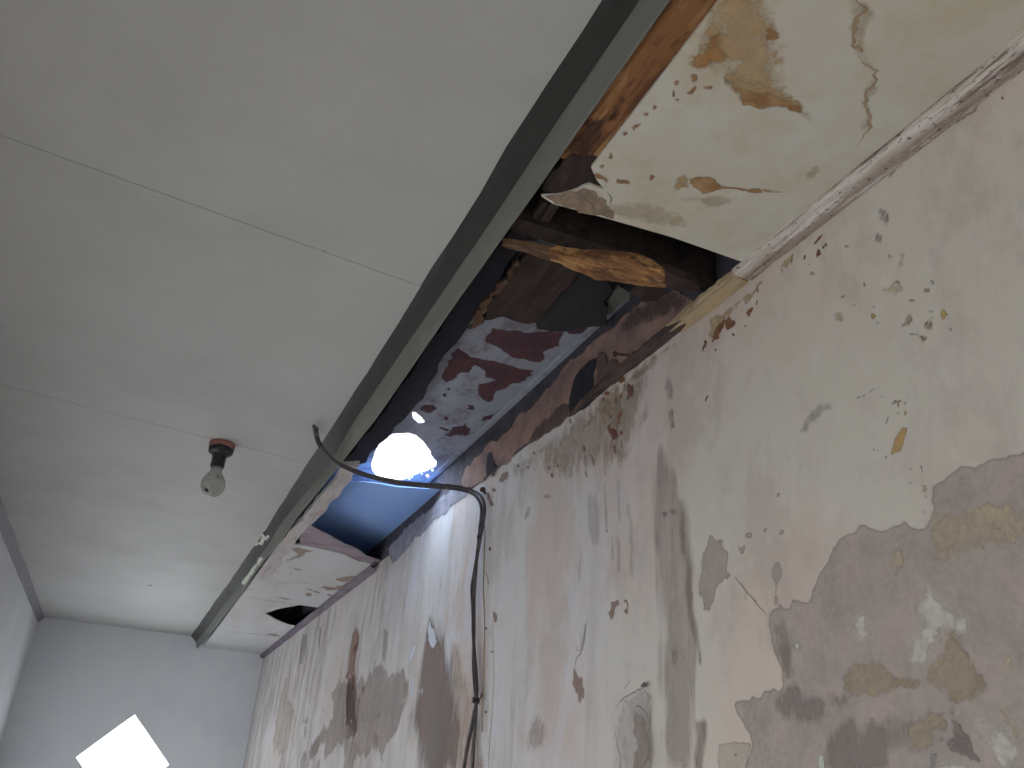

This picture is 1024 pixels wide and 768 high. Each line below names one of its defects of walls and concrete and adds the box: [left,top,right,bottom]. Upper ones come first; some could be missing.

leakage [692,0,802,113]
leakage [675,176,775,194]
flaking render [716,253,741,280]
flaking render [366,287,704,566]
leakage [487,464,529,506]
peeling [699,528,784,610]
flaking render [280,605,317,623]
peeling [735,453,1024,768]
leakage [414,621,480,768]
leakage [695,723,705,768]